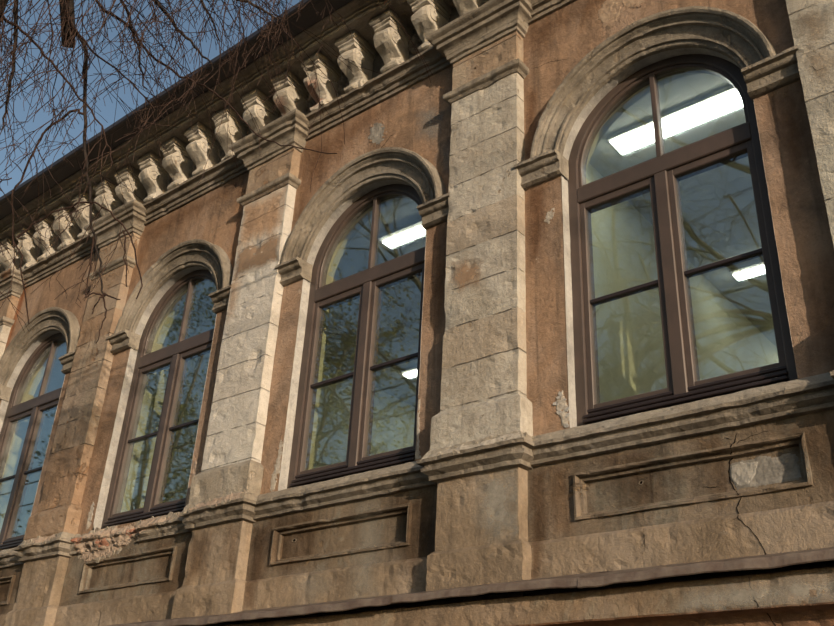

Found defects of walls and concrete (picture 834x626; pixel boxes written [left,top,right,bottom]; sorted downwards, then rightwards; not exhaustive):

spalling [553,390,570,428]
spalling [70,458,246,563]
crack [708,431,767,555]
peeling [729,453,801,490]